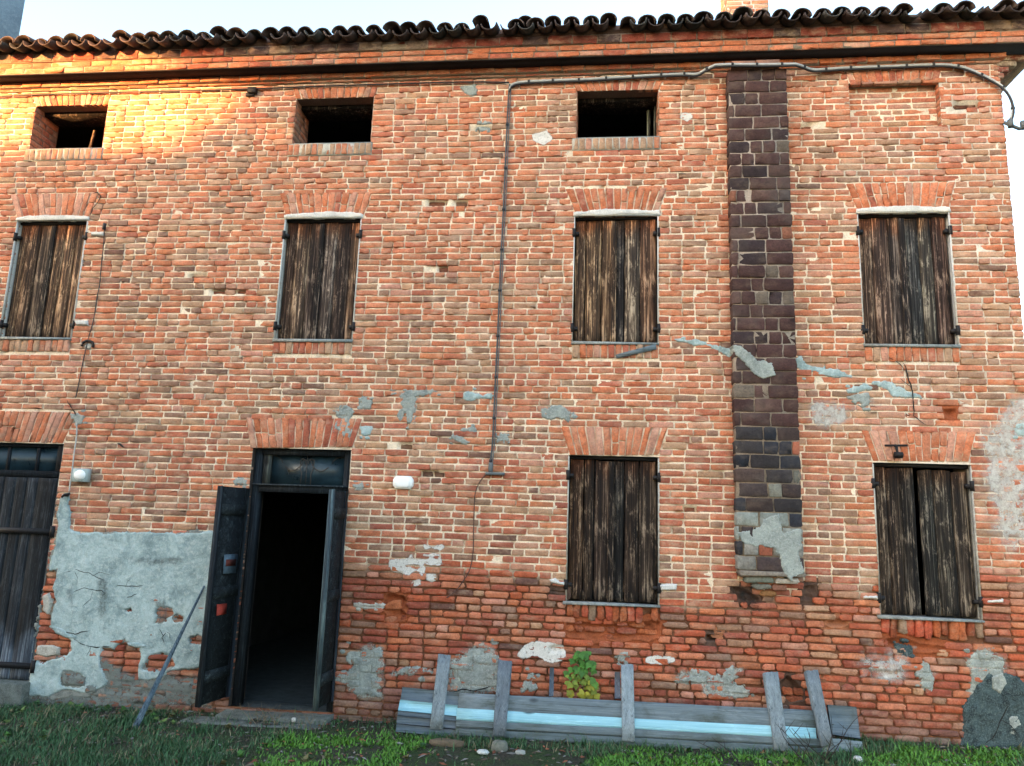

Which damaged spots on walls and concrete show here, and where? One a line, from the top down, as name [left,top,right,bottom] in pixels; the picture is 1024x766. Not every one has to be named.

crack [889,354,926,425]
crack [68,569,143,606]
peeling [36,592,77,657]
peeling [992,673,1007,694]